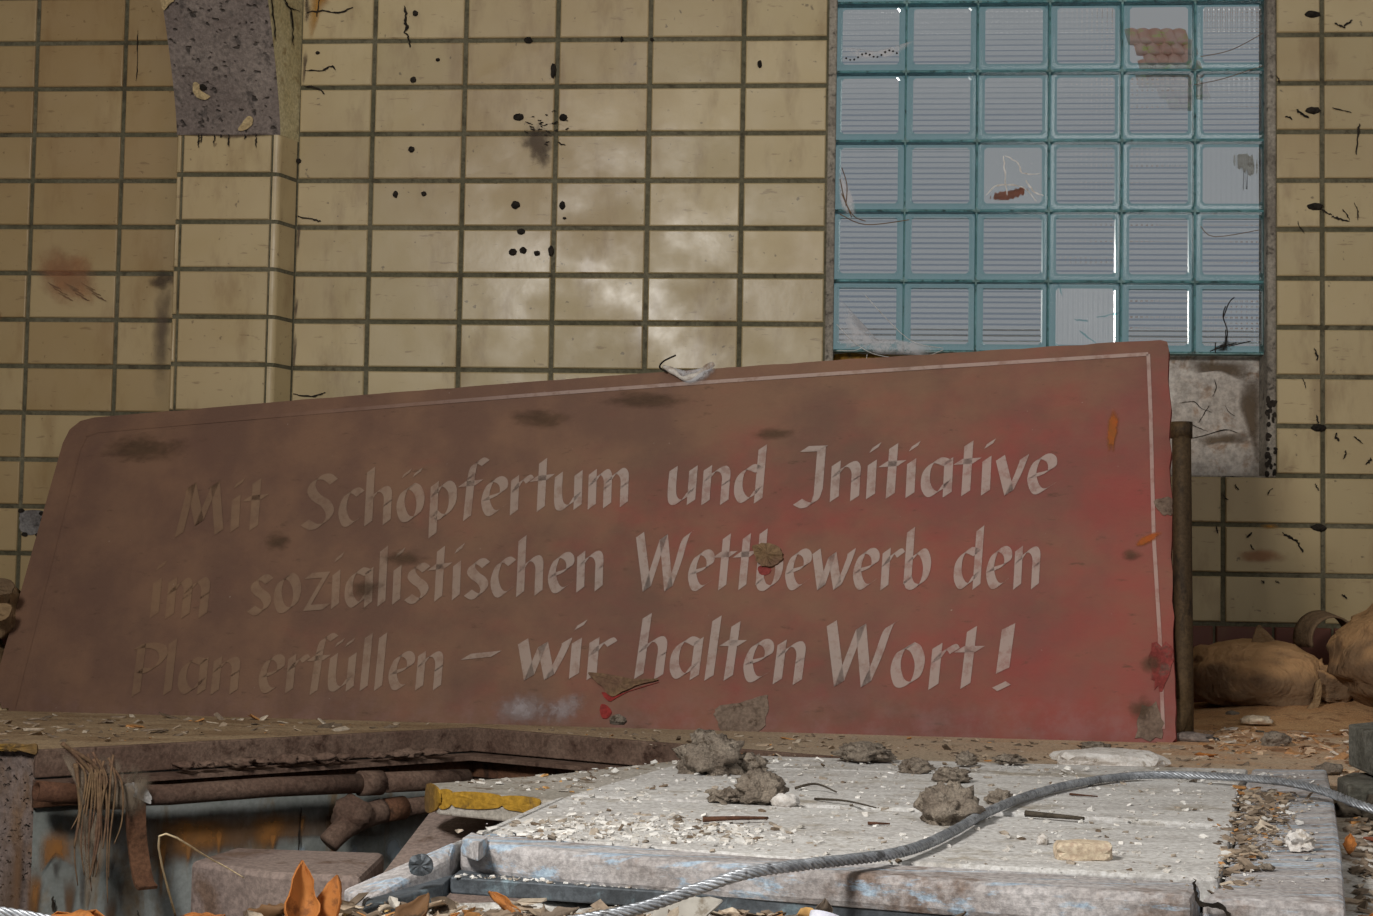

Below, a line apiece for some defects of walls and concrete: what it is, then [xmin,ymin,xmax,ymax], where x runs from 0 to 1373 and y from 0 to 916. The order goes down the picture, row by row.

spalling [193,82,210,100]
spalling [238,116,253,131]
corrosion [146,816,332,887]
corrosion [65,890,73,913]